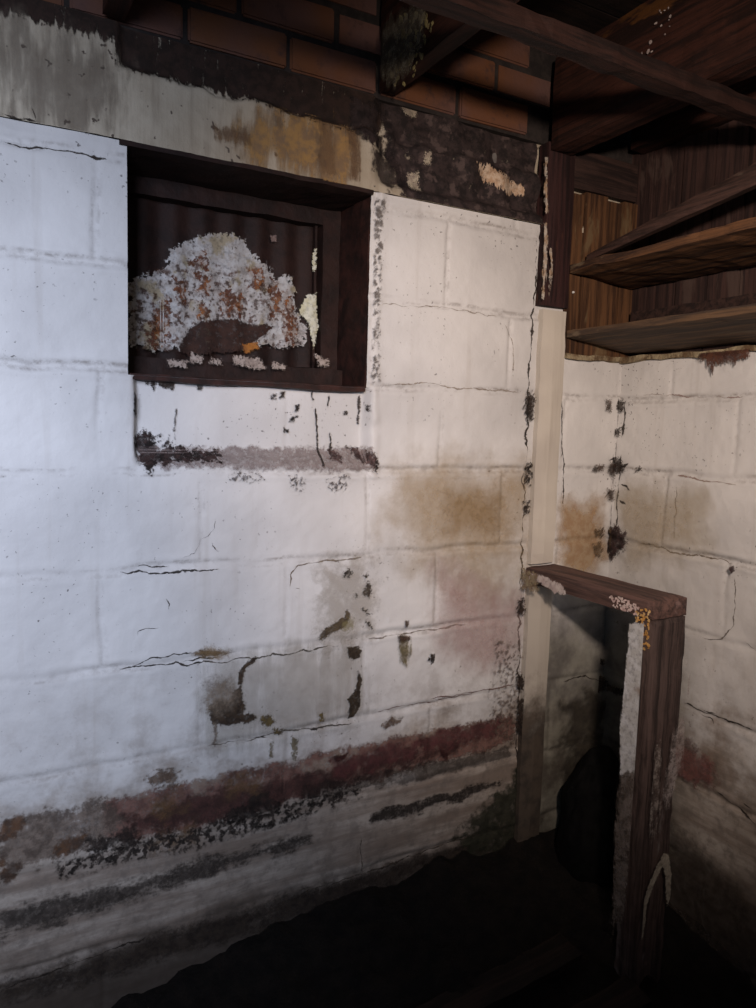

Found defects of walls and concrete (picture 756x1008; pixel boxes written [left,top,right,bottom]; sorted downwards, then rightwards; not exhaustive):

peeling [477,161,525,197]
peeling [128,232,330,371]
corrosion [698,349,750,375]
crack [385,241,537,583]
mould [523,390,536,424]
mould [593,457,642,501]
crack [123,524,217,574]
damp [560,505,629,571]
crack [123,646,334,669]
spalling [206,658,257,747]
spalling [347,671,362,718]
damp [0,768,517,998]